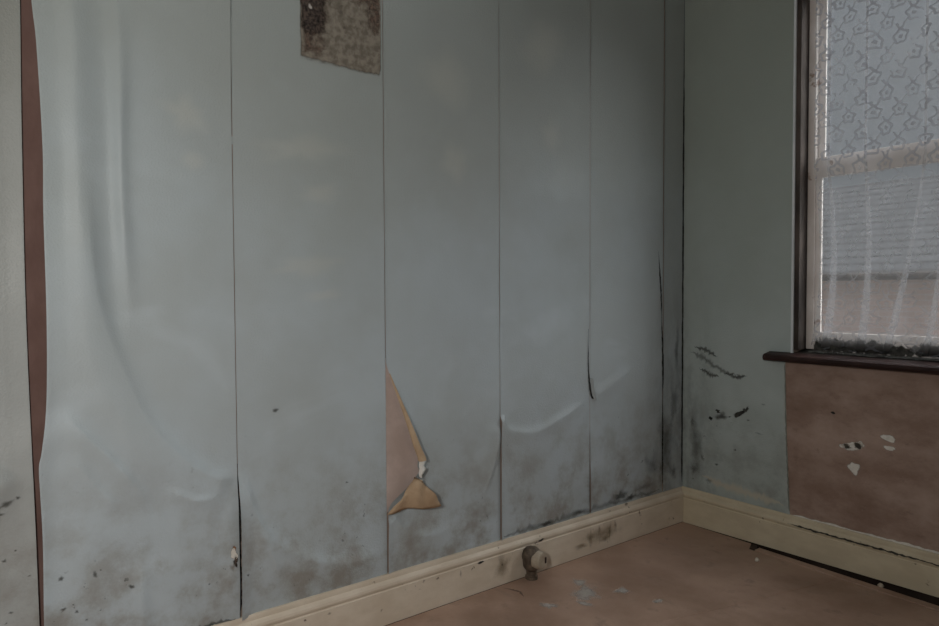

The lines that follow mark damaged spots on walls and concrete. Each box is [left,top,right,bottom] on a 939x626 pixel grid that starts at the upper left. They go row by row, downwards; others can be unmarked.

peeling [300,0,381,75]
peeling [786,362,939,554]